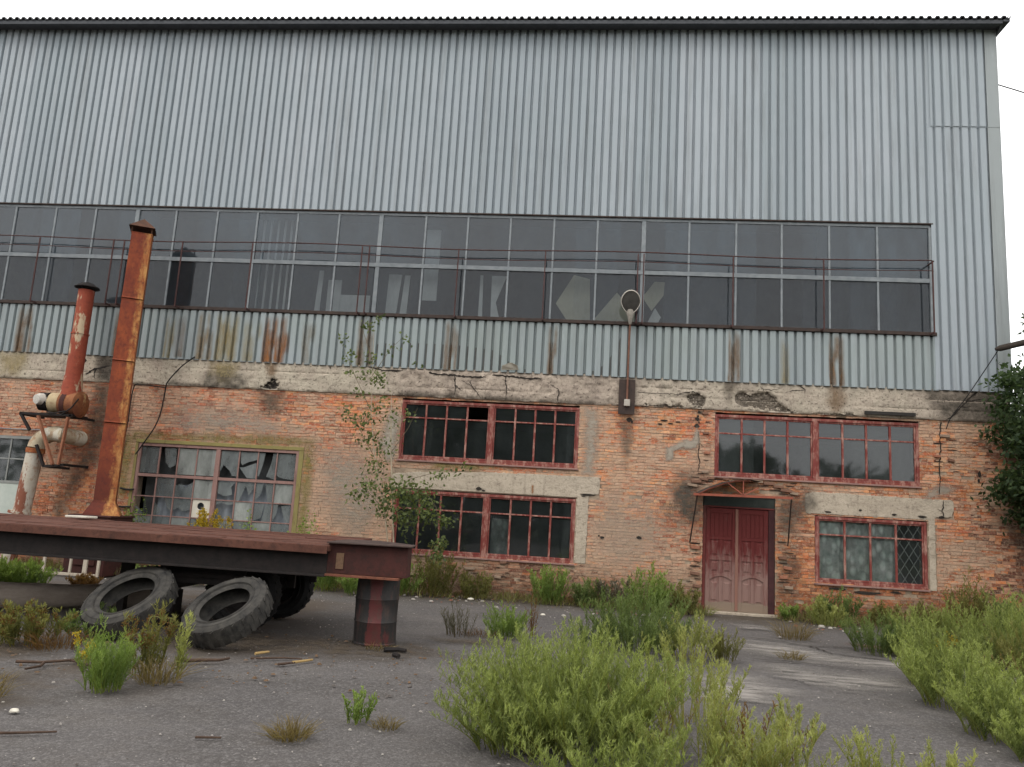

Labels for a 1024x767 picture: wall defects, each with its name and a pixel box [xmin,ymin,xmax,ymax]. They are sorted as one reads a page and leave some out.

corrosion [263,322,287,363]
corrosion [829,339,844,386]
spalling [260,378,281,389]
crack [429,371,560,401]
spalling [642,392,710,434]
spalling [735,392,796,413]